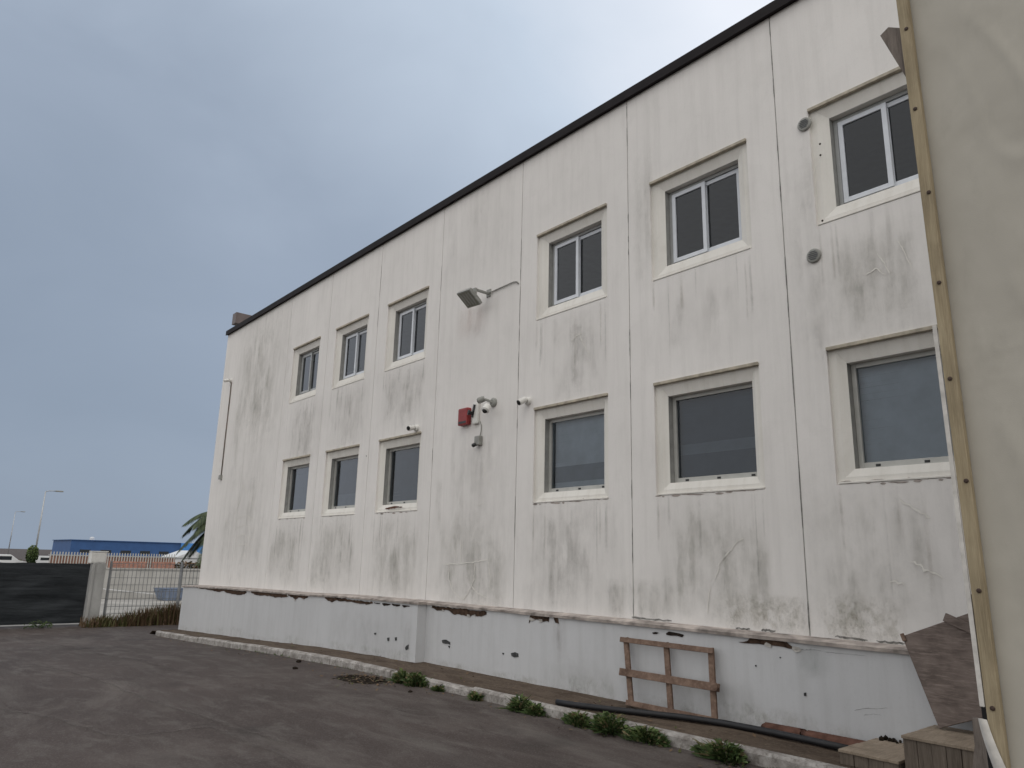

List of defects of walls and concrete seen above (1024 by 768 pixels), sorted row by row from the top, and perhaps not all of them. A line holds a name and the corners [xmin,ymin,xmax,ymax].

flaking render [325,597,410,607]
flaking render [431,606,486,617]
flaking render [529,615,559,623]
flaking render [741,638,801,658]